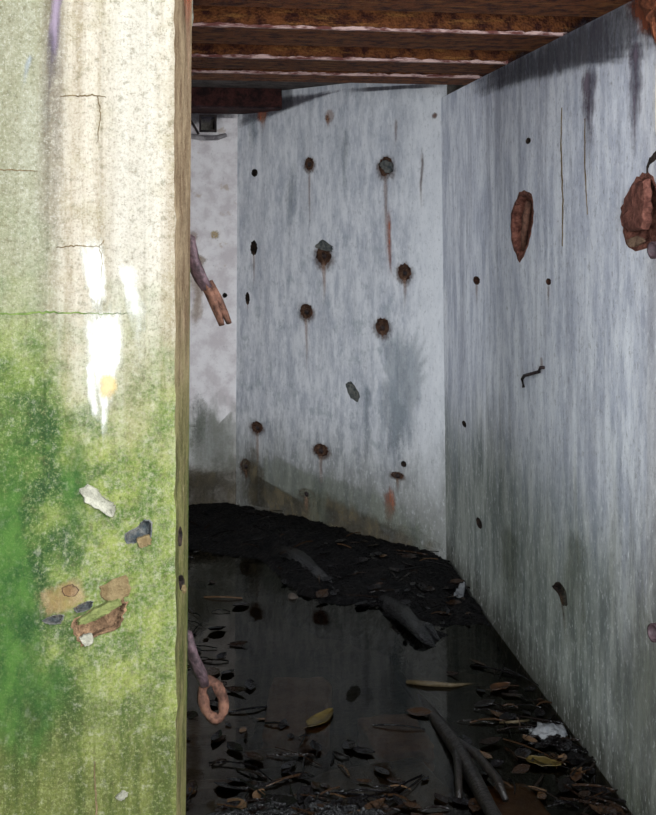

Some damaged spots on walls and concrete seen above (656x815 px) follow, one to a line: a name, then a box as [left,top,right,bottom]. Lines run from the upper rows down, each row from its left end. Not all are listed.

corrosion [630,0,656,43]
corrosion [315,249,332,269]
corrosion [388,221,412,283]
damp [82,244,121,424]
damp [121,268,140,316]
corrosion [300,305,313,321]
corrosion [376,320,390,338]
corrosion [313,445,329,459]
damp [188,471,235,506]
damp [249,454,416,547]
spalling [42,575,131,647]